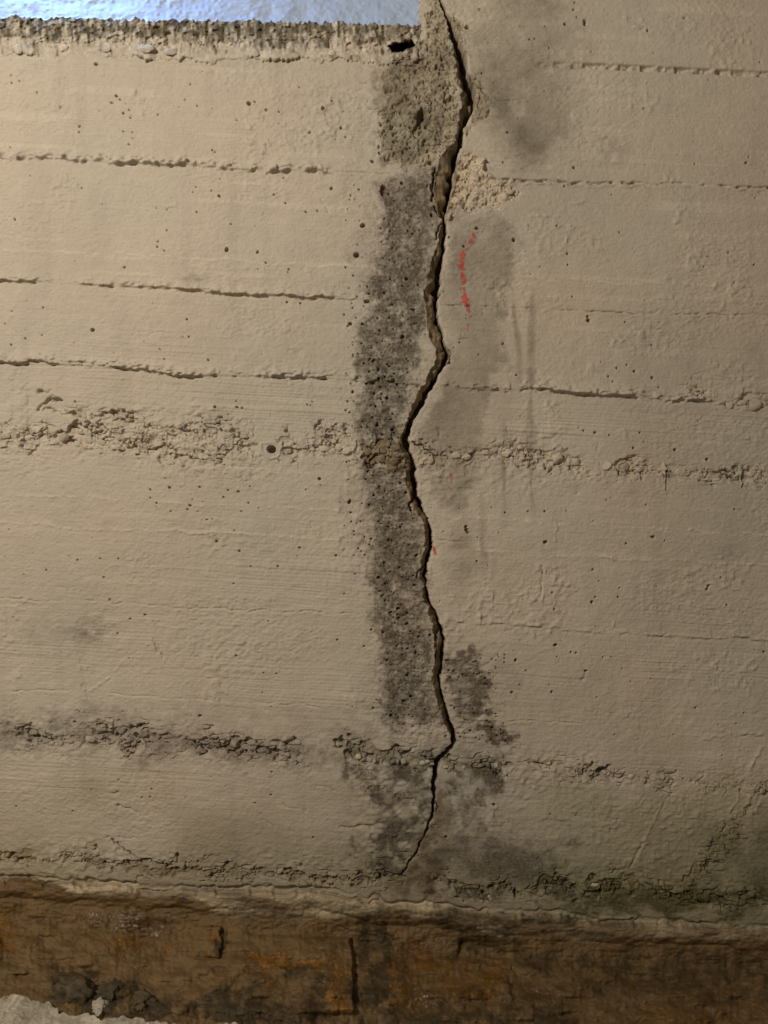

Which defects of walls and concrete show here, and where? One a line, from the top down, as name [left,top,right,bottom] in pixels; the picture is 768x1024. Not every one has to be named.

spalling [0,0,491,172]
damp [349,167,436,444]
spalling [447,153,521,221]
crack [385,1,485,877]
damp [339,462,438,725]
damp [444,645,520,810]